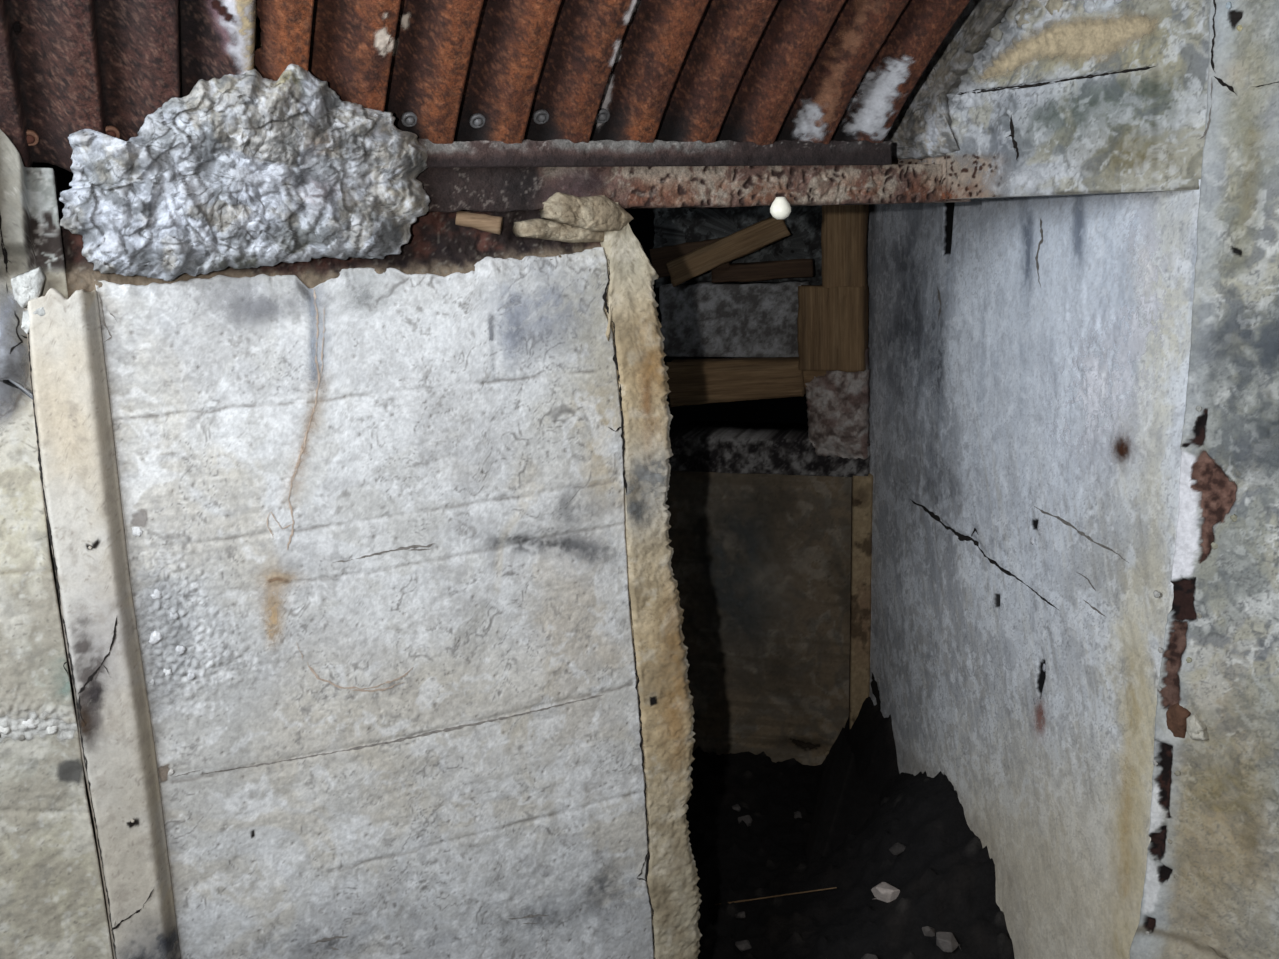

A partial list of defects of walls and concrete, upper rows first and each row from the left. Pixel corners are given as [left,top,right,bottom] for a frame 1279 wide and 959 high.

efflorescence [211,0,261,75]
efflorescence [794,104,826,140]
efflorescence [844,57,909,140]
crack [1198,0,1278,140]
rust [892,155,996,199]
hole [1182,406,1208,447]
crack [910,499,1106,617]
crack [1034,506,1129,563]
rust [266,572,292,636]
spalling [1153,577,1202,622]
spalling [1149,743,1181,883]
spalling [1144,917,1156,935]